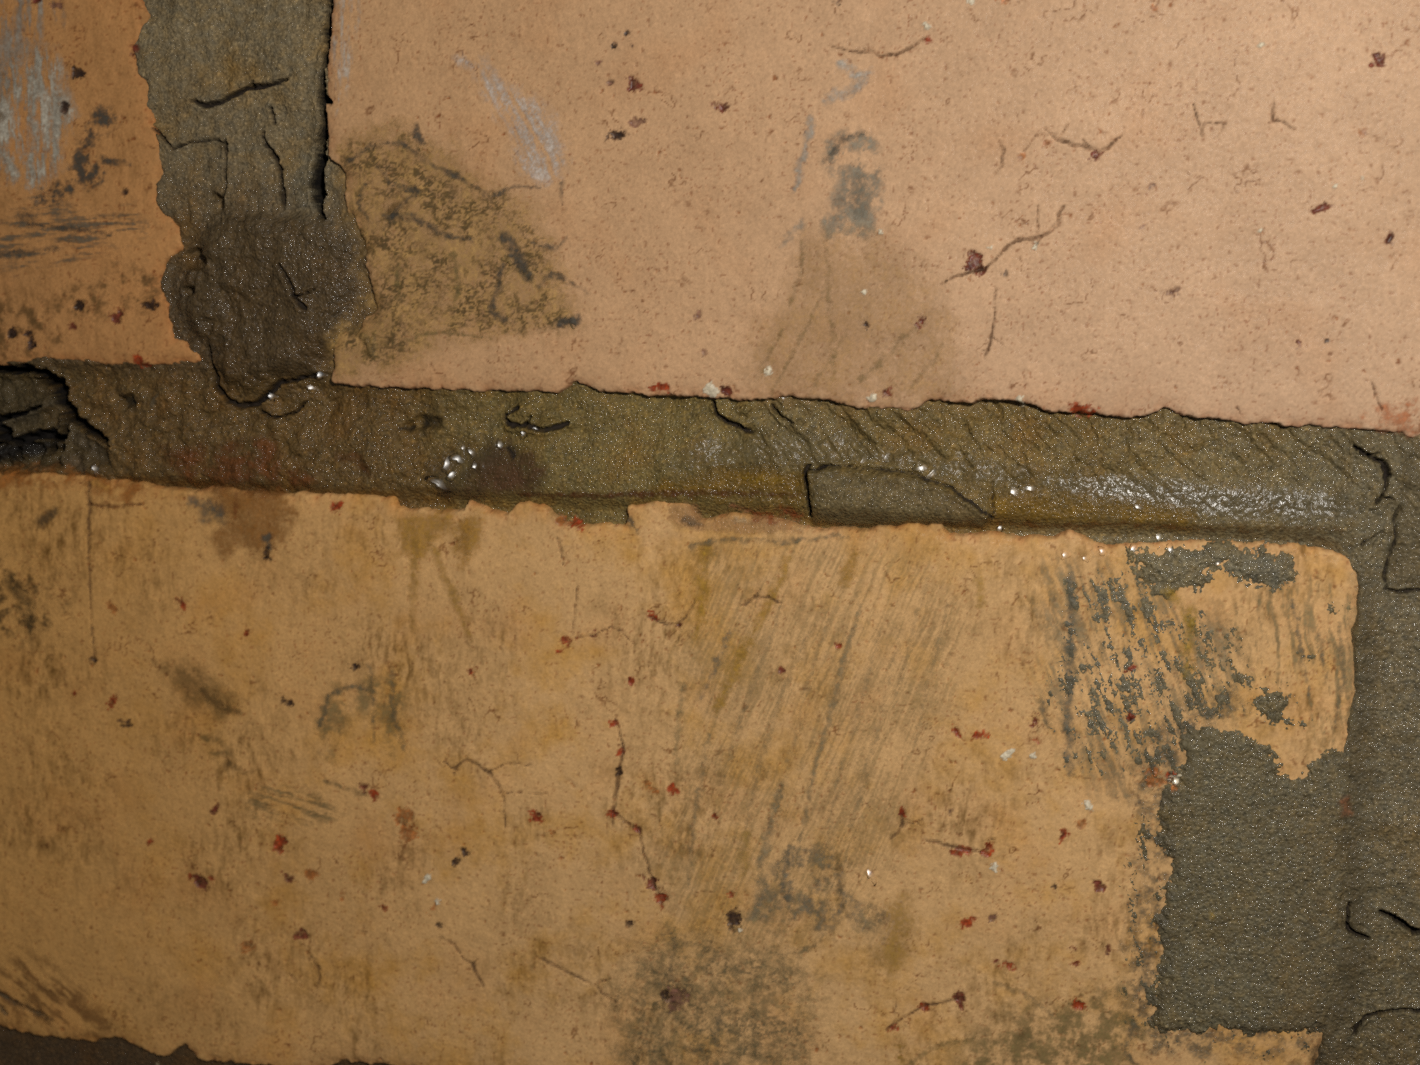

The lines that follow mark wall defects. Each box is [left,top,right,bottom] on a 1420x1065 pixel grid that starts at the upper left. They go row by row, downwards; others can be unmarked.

crack [154,0,334,219]
damp [331,128,580,374]
crack [0,363,109,452]
crack [1353,445,1420,592]
damp [1061,573,1085,734]
damp [1258,600,1350,722]
crack [1346,902,1420,938]
crack [1353,1008,1420,1034]